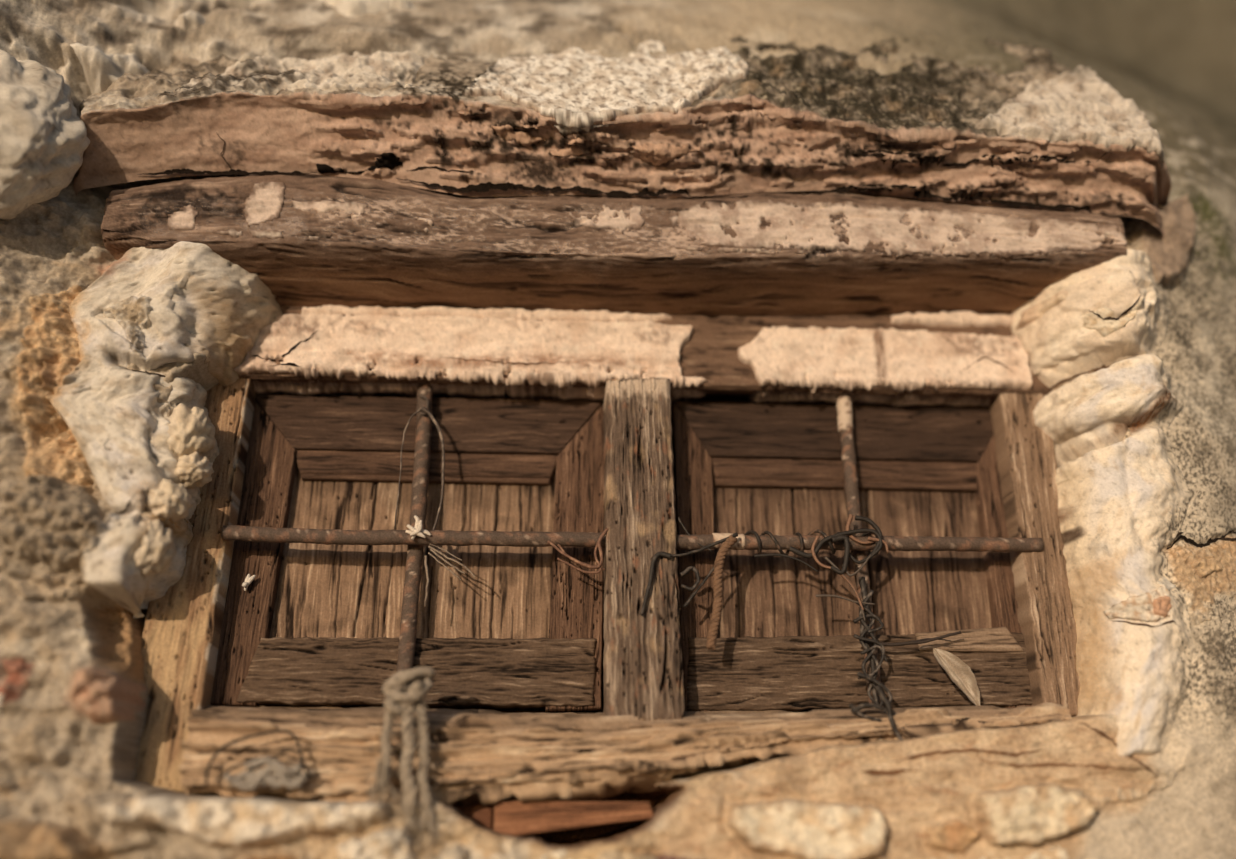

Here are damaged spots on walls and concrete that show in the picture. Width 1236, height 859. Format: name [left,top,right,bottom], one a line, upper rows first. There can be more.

crack [139,132,317,176]
spalling [0,284,153,619]
crack [1167,530,1236,549]
spalling [1104,542,1236,626]